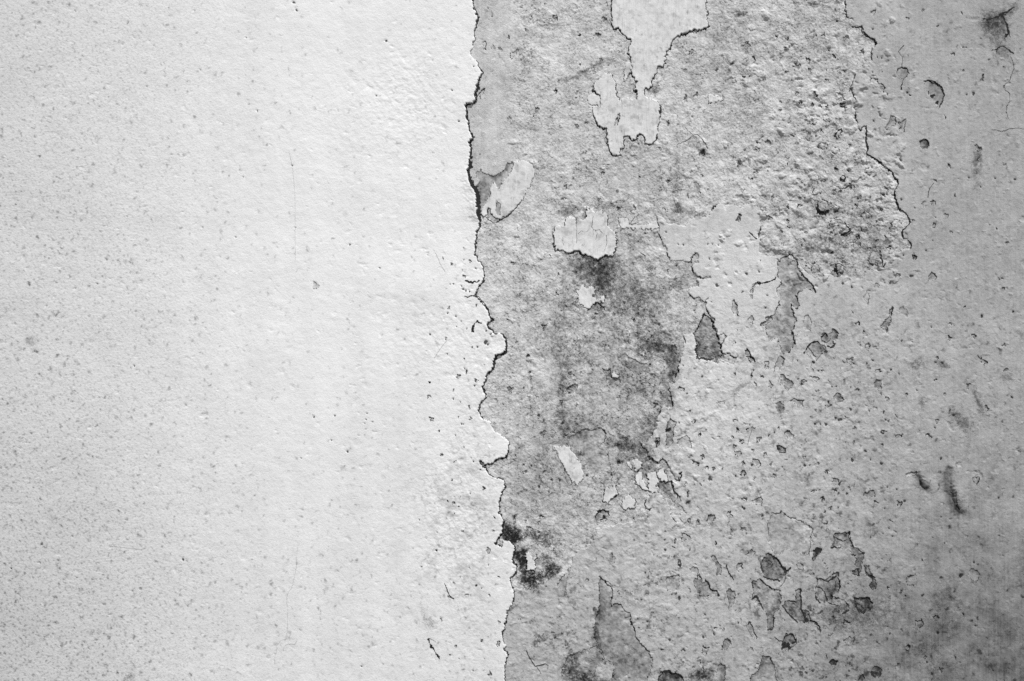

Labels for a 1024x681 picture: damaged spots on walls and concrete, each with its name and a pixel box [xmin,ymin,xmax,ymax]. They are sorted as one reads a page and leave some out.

water stain [577,258,615,285]
spalling [443,0,949,652]
water stain [640,338,676,357]
water stain [502,515,560,589]
spalling [562,578,684,681]
peeling [700,625,732,664]
peeling [716,664,726,681]
peeling [750,656,777,681]
peeling [826,655,882,681]